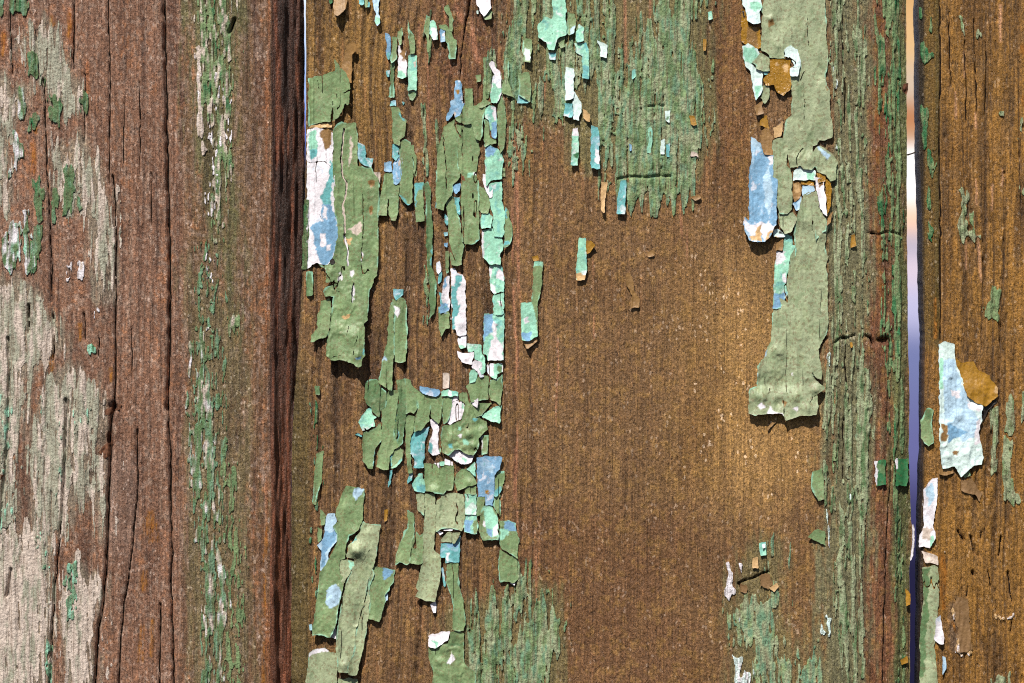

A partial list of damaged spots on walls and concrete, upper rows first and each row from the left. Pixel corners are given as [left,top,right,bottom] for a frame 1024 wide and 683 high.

peeling [0,0,122,683]
crack [73,0,175,683]
peeling [301,0,716,683]
peeling [722,0,1024,683]